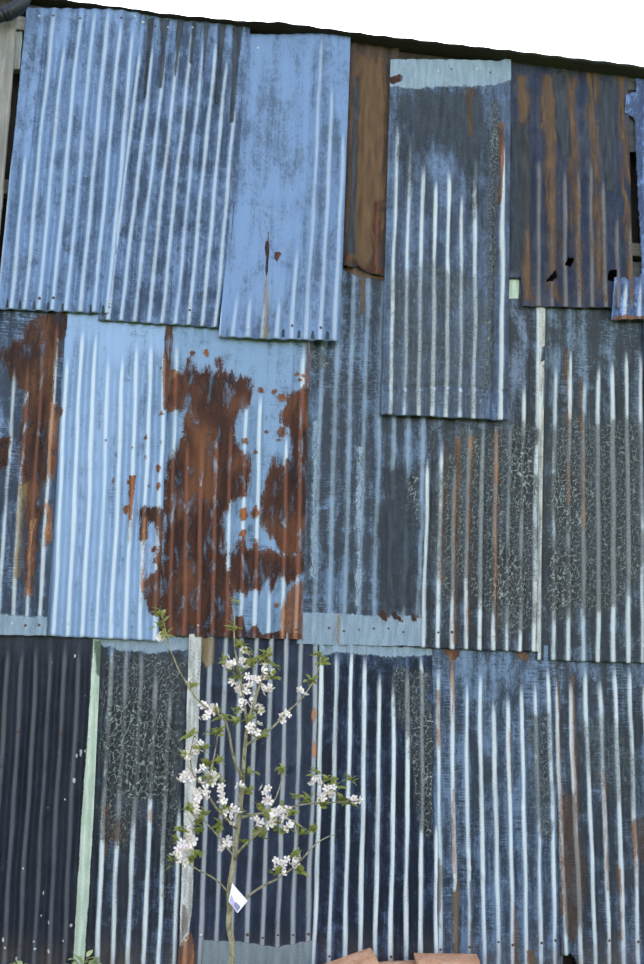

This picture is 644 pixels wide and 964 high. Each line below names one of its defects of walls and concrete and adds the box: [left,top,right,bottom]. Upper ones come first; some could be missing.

rust [344,54,403,315]
rust [498,71,633,304]
rust [0,311,67,597]
rust [123,325,310,639]